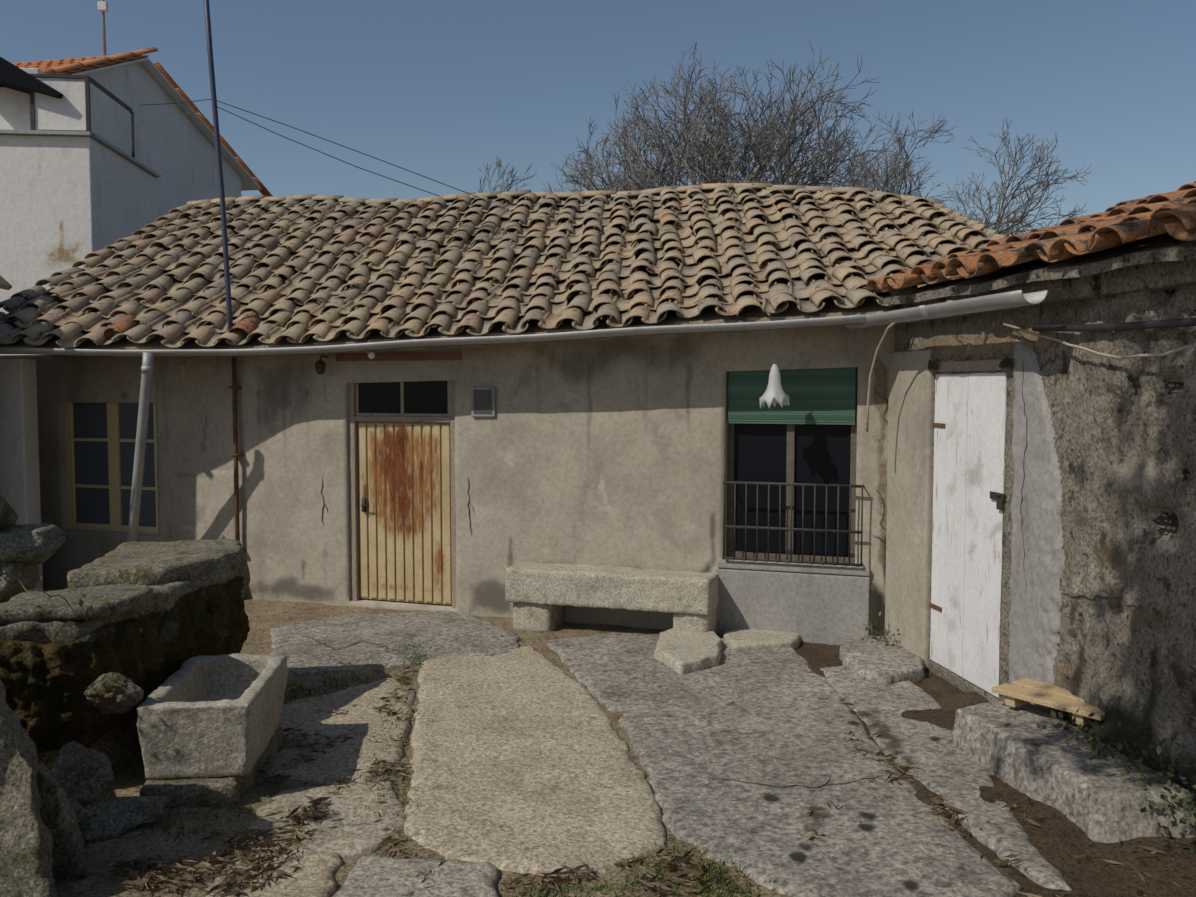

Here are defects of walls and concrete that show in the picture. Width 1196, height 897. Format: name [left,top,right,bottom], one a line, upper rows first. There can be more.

corrosion [363,425,439,534]